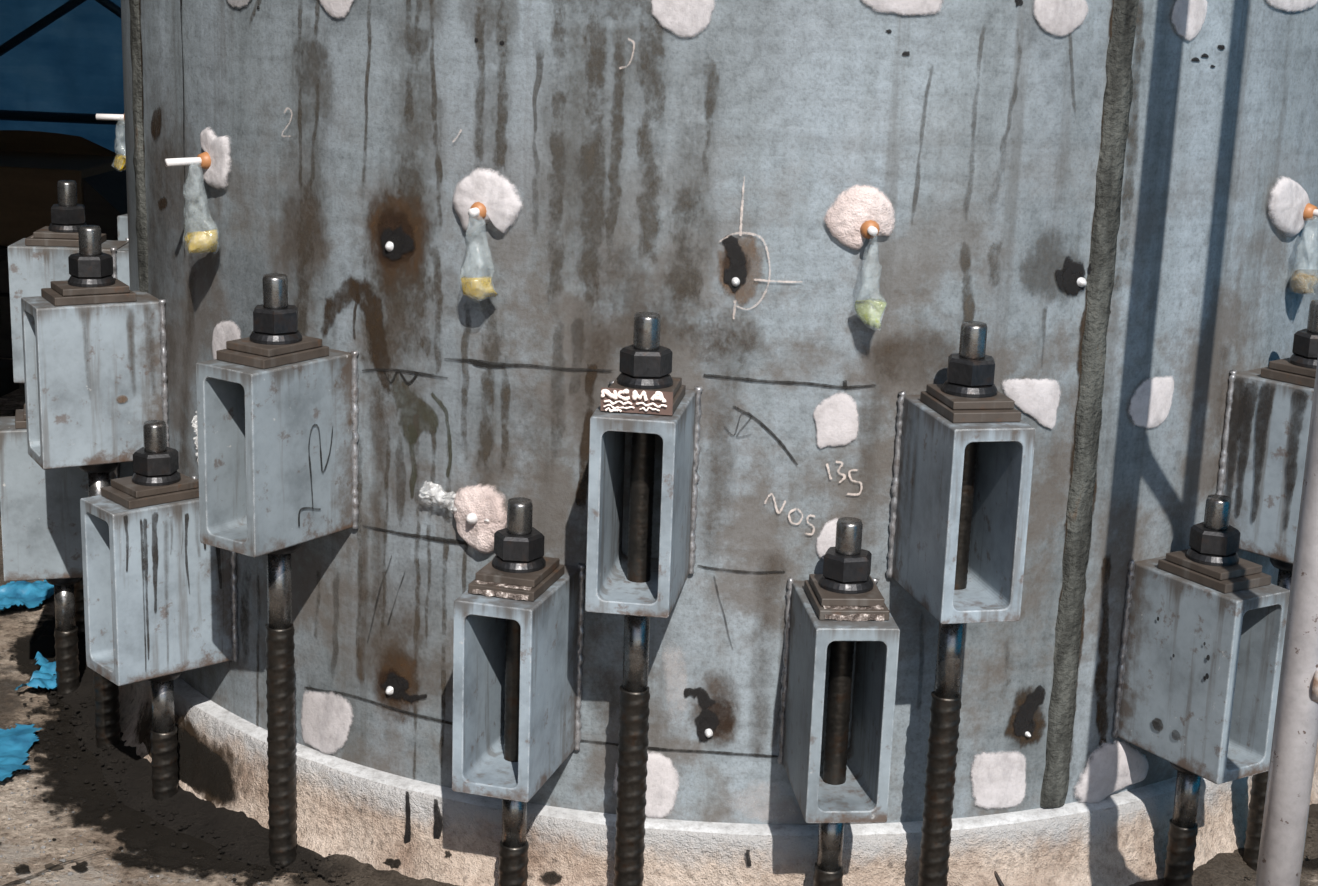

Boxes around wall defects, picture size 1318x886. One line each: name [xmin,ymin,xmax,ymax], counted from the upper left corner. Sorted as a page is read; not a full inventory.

damp [476,0,509,68]
damp [476,72,508,167]
damp [533,54,543,131]
damp [548,9,664,299]
damp [705,71,718,118]
corrosion [323,196,429,391]
corrosion [358,614,420,720]
corrosion [696,679,735,743]